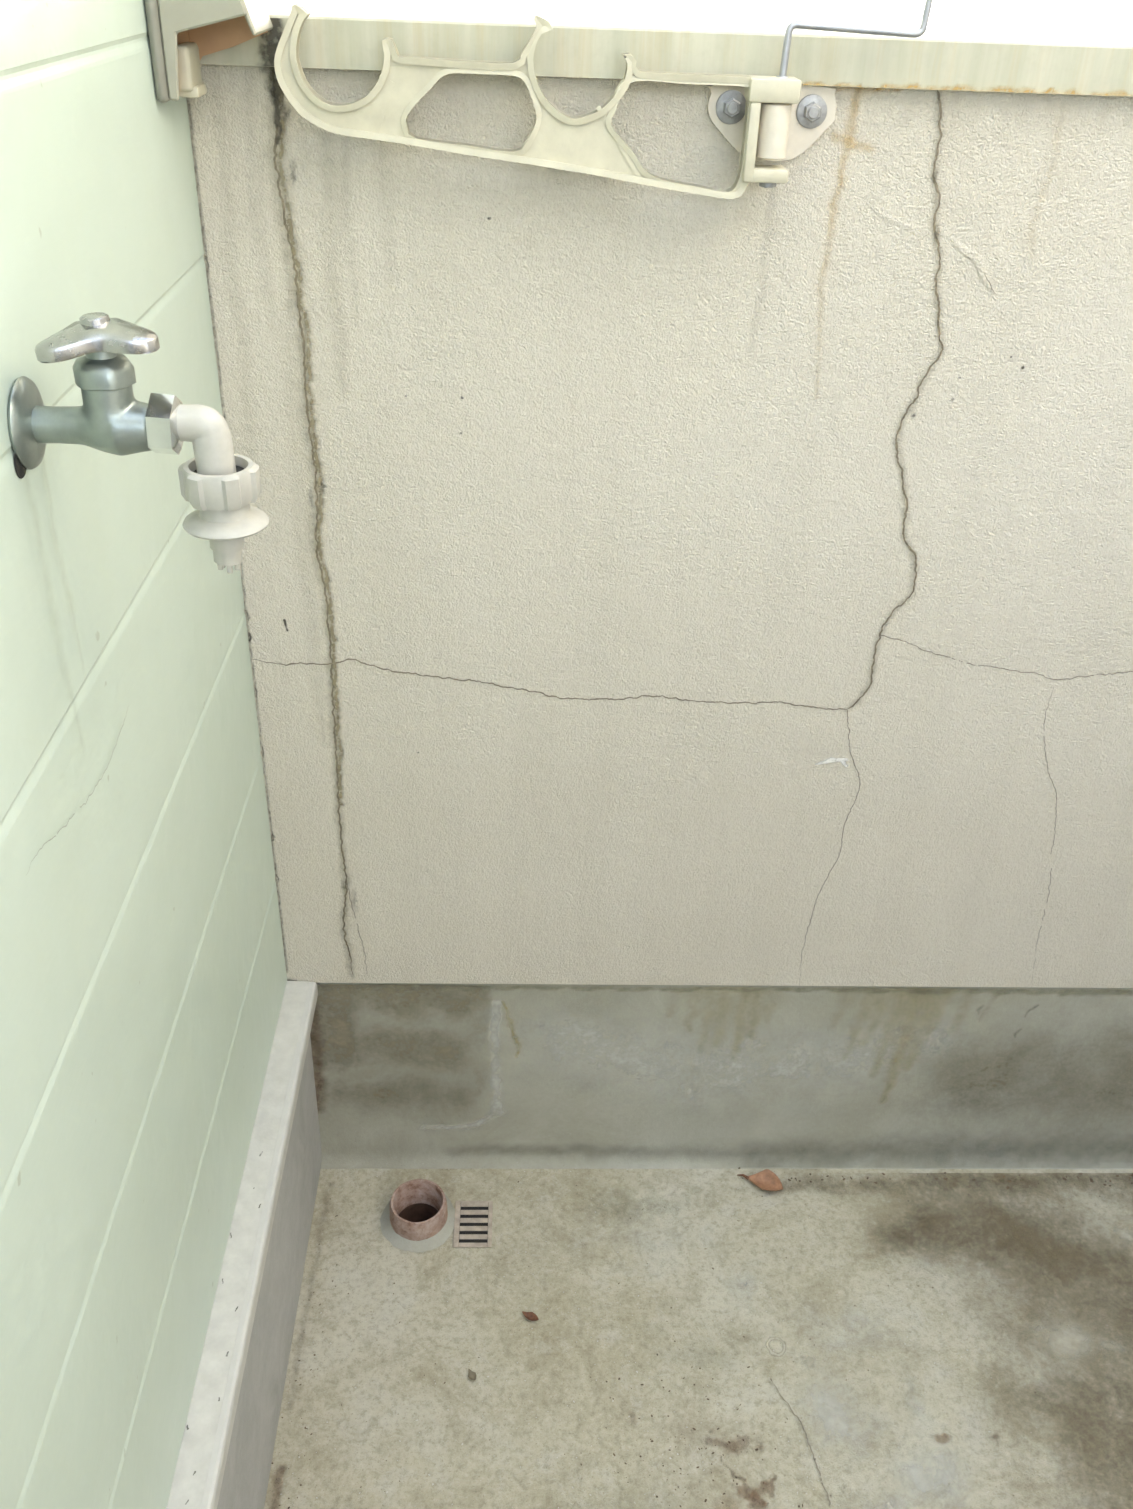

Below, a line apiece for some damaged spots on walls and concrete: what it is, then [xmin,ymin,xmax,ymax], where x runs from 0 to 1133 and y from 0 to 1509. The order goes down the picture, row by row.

crack [253,90,1133,988]